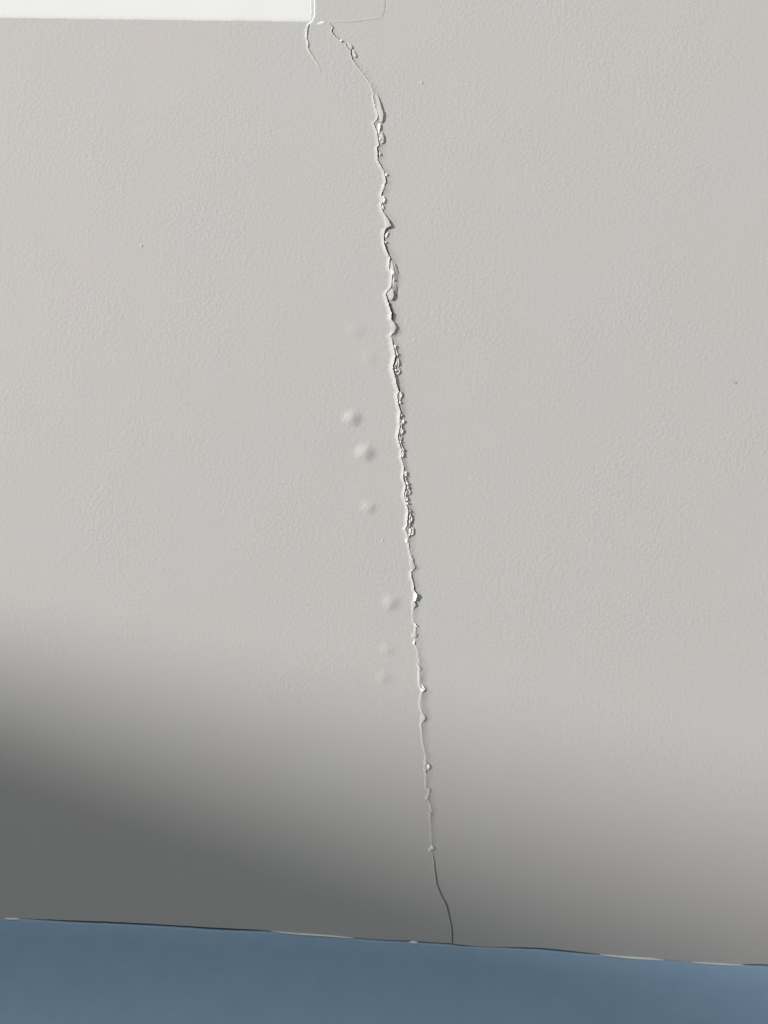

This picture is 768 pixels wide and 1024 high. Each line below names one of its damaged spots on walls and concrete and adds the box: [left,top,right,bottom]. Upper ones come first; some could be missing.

crack [303,0,458,944]